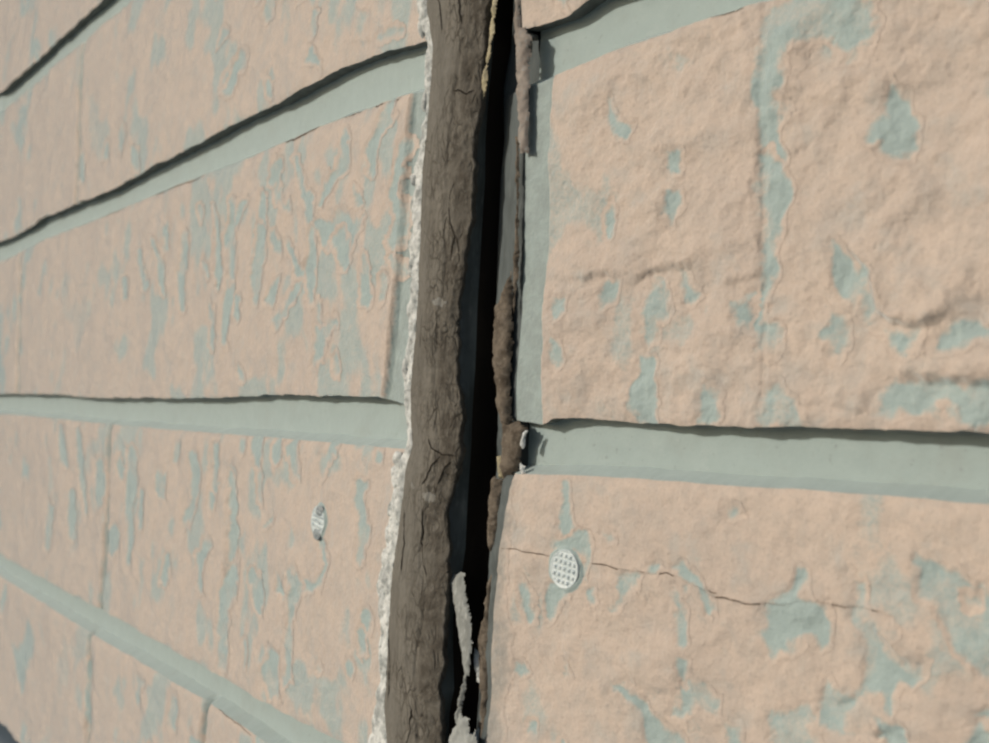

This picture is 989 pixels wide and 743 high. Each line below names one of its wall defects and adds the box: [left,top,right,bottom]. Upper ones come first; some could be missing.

crack [438,0,462,31]
peeling [860,70,925,165]
crack [448,183,459,271]
peeling [722,0,886,427]
peeling [368,0,433,743]
spalling [449,0,513,743]
peeling [623,263,705,424]
peeling [692,381,726,426]
peeling [814,234,989,433]
crack [589,562,881,612]
peeling [755,560,934,743]
peeling [908,546,989,743]